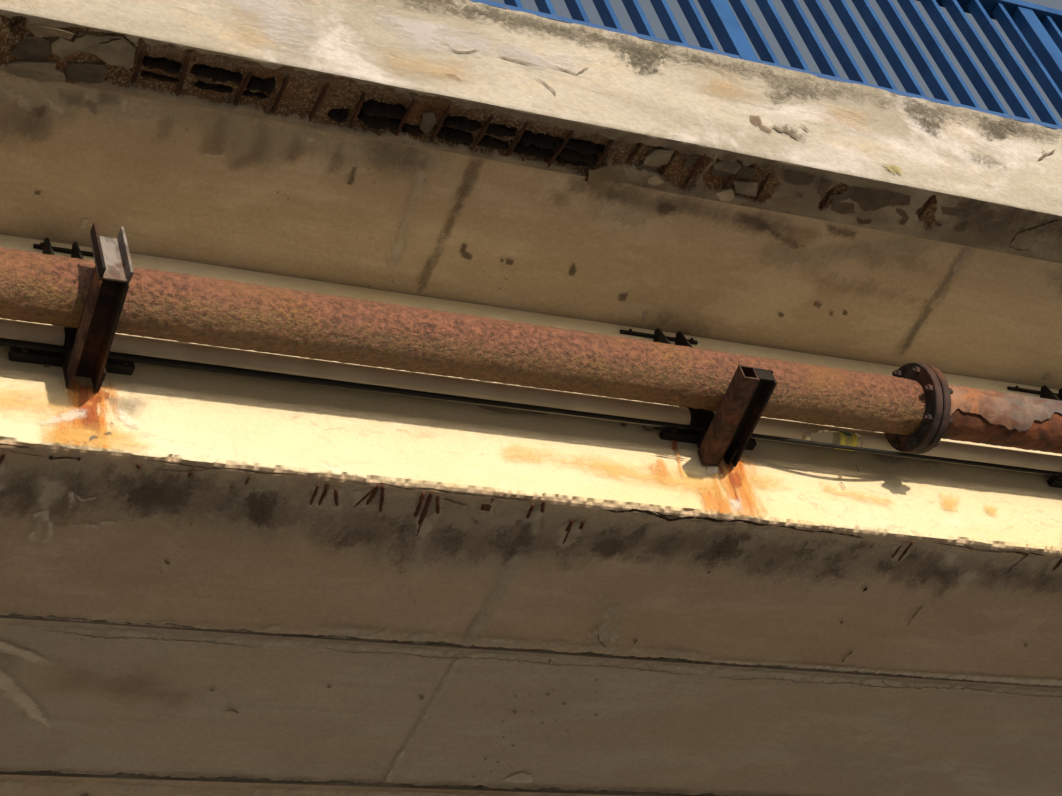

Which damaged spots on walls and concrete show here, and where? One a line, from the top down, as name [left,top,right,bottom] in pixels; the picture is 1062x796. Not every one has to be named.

spalling [0,15,968,237]
crack [1009,220,1061,250]
rust [49,381,135,449]
damp [0,453,1062,594]
rust [588,440,761,516]
damp [66,607,1062,796]